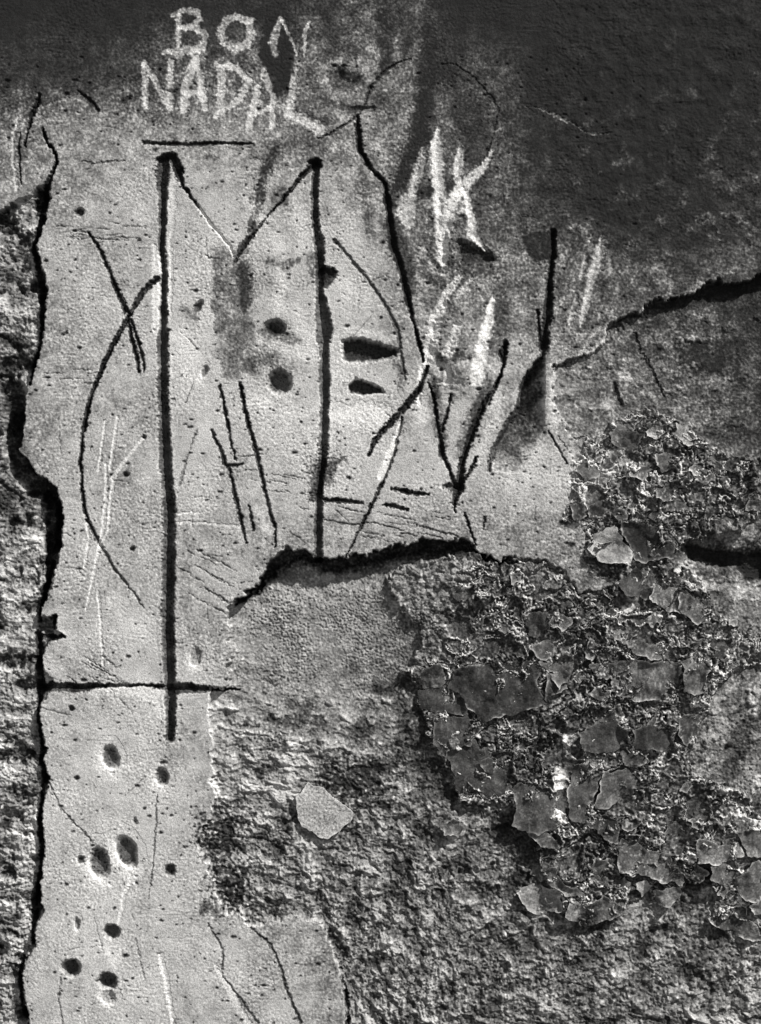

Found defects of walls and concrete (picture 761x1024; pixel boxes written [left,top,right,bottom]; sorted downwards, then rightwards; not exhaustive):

spalling [0,186,65,1024]
spalling [209,274,761,1024]
crack [633,329,666,398]